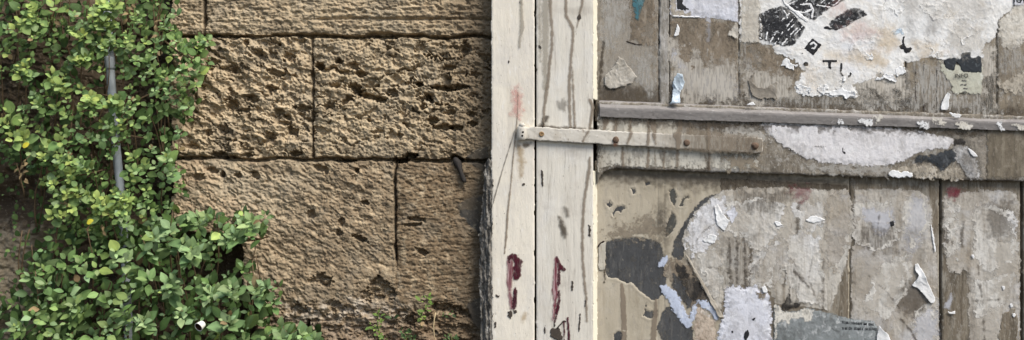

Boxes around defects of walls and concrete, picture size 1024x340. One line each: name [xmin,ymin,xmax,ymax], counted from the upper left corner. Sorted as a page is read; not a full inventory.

peeling [588,189,717,340]